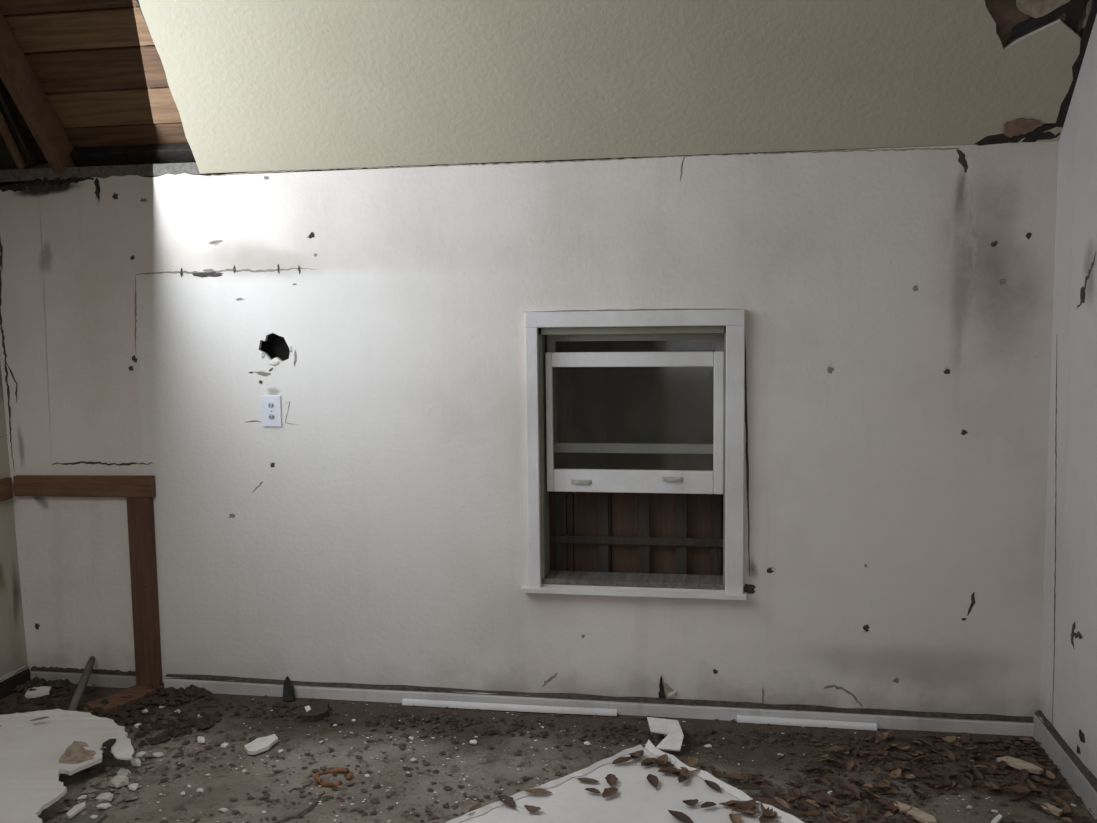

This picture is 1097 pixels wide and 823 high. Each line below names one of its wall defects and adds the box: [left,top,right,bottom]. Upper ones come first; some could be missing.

spalling [249,333,293,384]